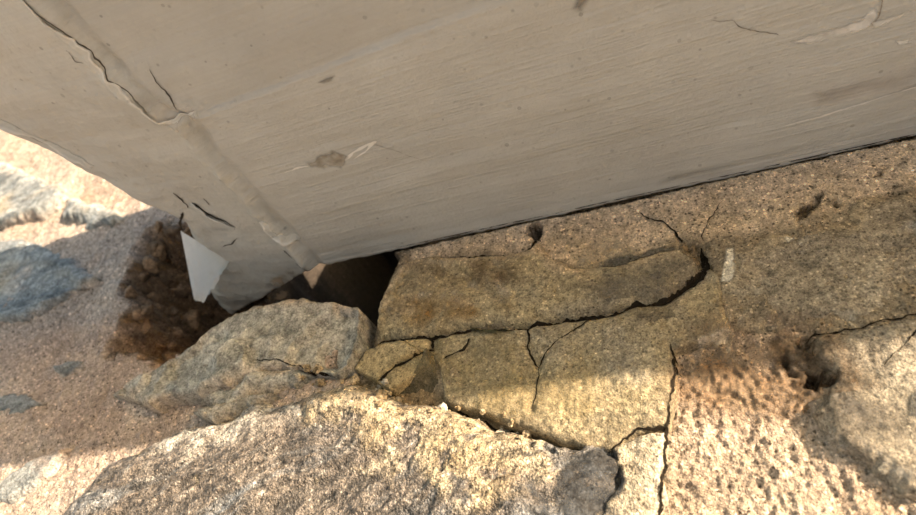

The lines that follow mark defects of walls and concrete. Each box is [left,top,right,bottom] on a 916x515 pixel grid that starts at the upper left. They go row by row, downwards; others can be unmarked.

crack [21,0,198,126]
peeling [286,141,377,172]
crack [378,134,916,408]
crack [447,408,532,440]
crack [611,343,678,515]